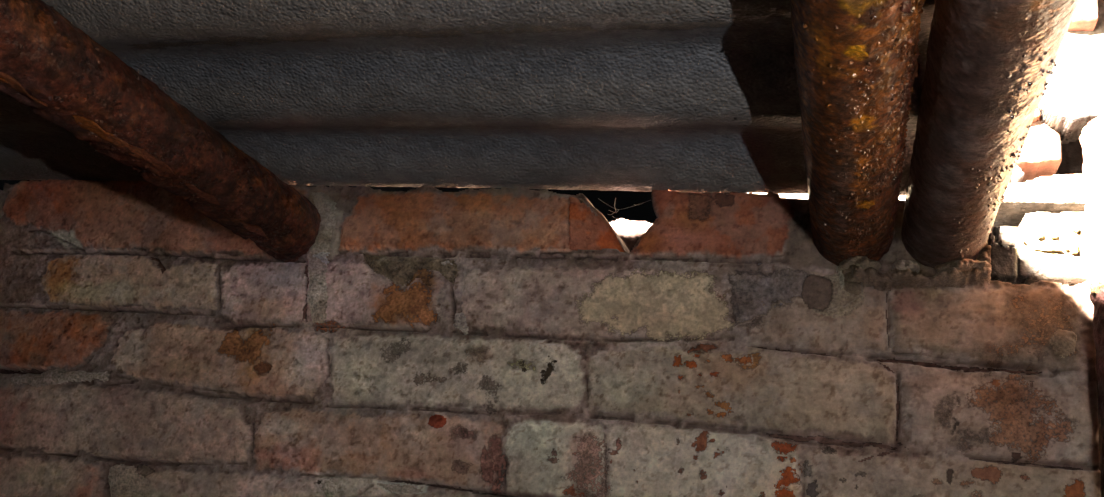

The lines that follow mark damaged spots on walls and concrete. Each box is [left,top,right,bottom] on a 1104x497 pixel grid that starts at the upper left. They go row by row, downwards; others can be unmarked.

corrosion [844,45,868,58]